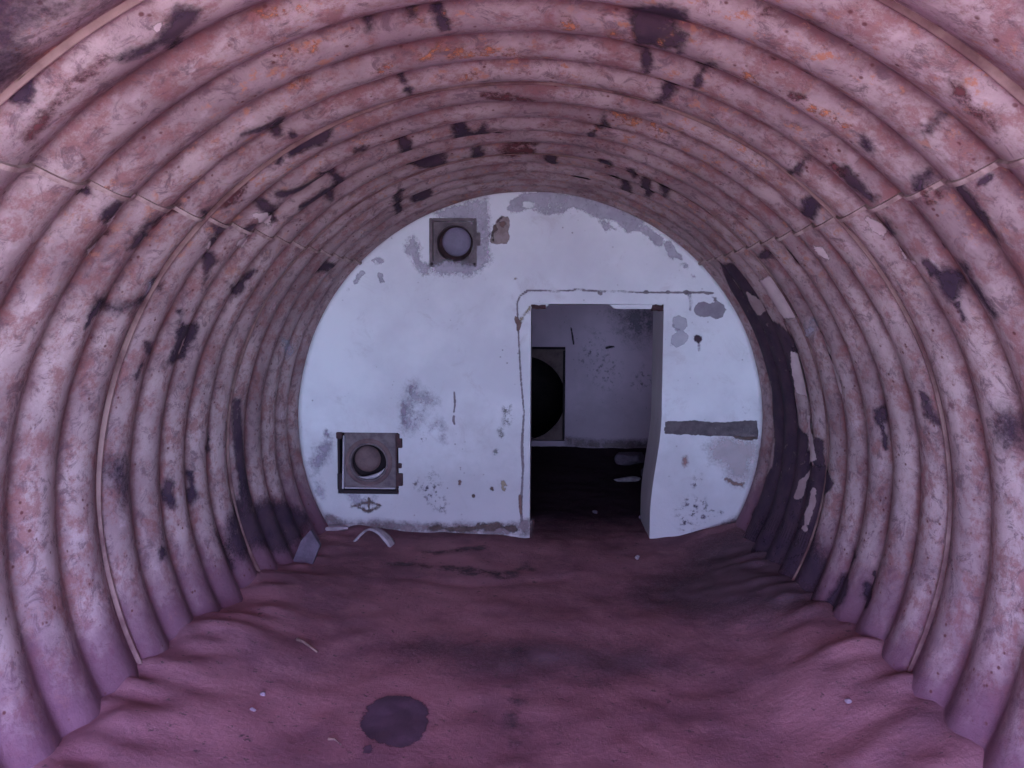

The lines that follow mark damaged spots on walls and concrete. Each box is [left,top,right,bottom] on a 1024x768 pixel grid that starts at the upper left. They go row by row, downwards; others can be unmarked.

peeling [628,6,689,73]
corrosion [480,92,533,102]
peeling [693,62,714,88]
corrosion [950,82,996,132]
peeling [240,116,333,165]
corrosion [500,142,536,158]
flaking render [405,192,693,277]
flaking render [694,297,726,319]
peeling [922,259,997,321]
peeling [169,309,200,364]
peeling [720,263,843,563]